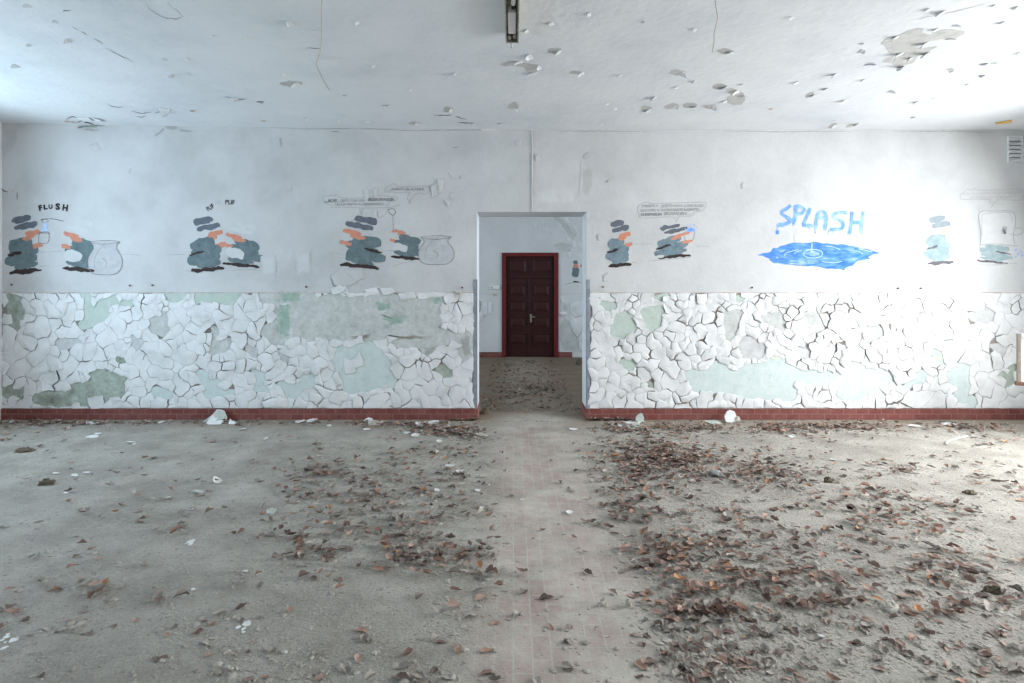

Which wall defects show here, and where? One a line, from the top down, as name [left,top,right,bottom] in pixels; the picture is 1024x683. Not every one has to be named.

peeling [501,54,542,76]
peeling [857,26,965,72]
peeling [641,83,748,113]
flaking render [63,116,109,134]
peeling [1,291,492,409]
peeling [559,293,1024,409]